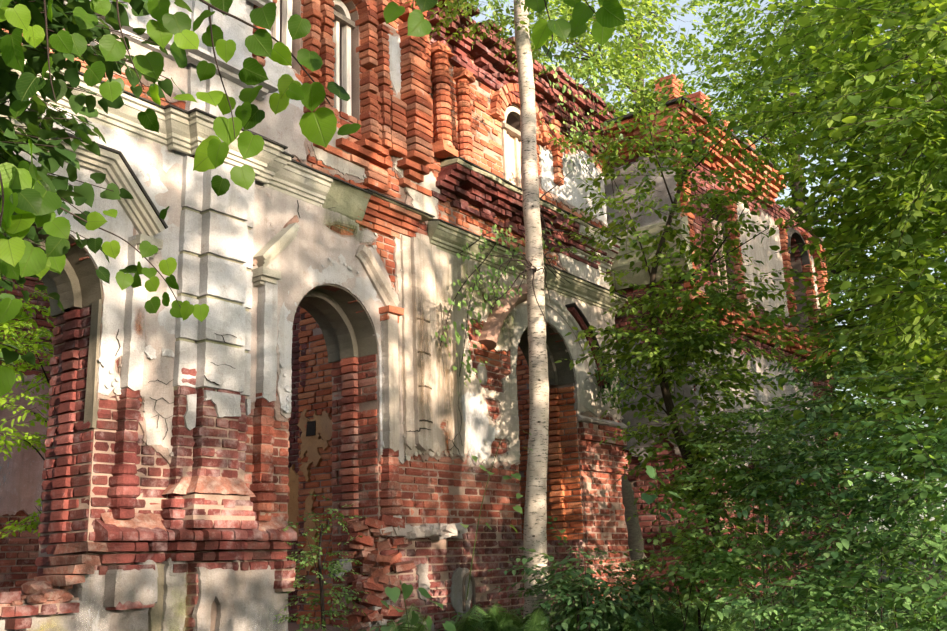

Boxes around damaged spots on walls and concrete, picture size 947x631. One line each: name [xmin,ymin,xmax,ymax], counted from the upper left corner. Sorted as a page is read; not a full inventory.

flaking render [316,155,413,203]
flaking render [90,357,122,518]
flaking render [135,392,174,514]
peeling [144,345,175,359]
crack [148,379,175,440]
flaking render [244,398,254,489]
flaking render [271,362,292,521]
flaking render [346,317,522,631]